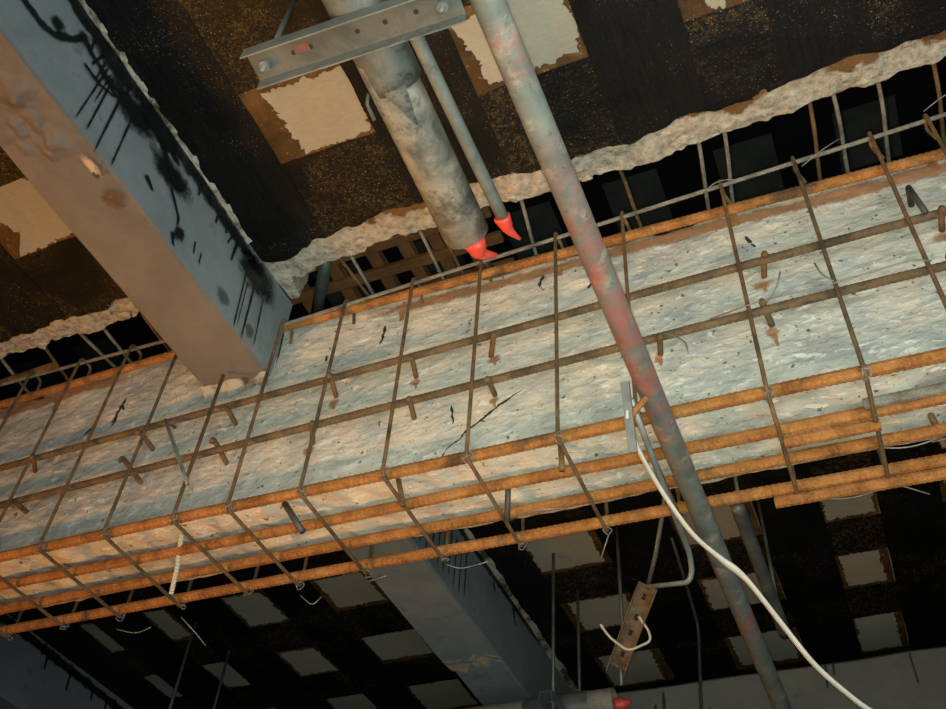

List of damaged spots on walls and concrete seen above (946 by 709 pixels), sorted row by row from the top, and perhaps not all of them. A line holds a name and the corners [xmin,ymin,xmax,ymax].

peeling [79,0,252,244]
spalling [571,30,946,182]
spalling [0,297,139,359]
damp [22,0,274,343]
spalling [263,202,437,299]
rust [383,258,583,321]
spalling [492,170,551,203]
rust [768,328,779,346]
rust [607,162,946,257]
rust [0,378,127,418]
spalling [201,371,268,403]
peeling [349,538,503,673]